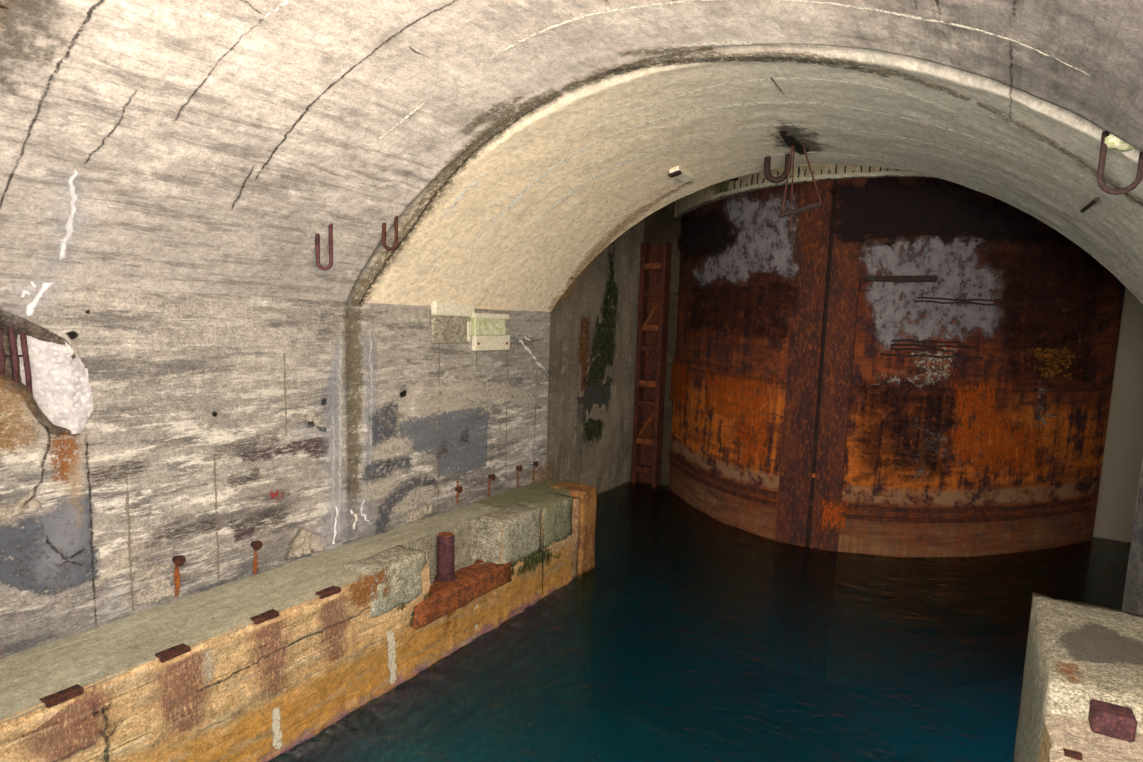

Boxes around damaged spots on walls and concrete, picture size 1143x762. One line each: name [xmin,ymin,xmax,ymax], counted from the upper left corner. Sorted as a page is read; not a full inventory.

damp [0,0,64,92]
crack [0,0,104,207]
crack [86,92,136,162]
crack [174,0,261,121]
crack [232,0,456,209]
damp [329,45,1143,545]
spalling [0,310,93,436]
spalling [0,491,40,521]
rust [27,687,104,762]
rust [158,654,205,733]
rust [256,622,285,694]
rust [321,570,389,660]